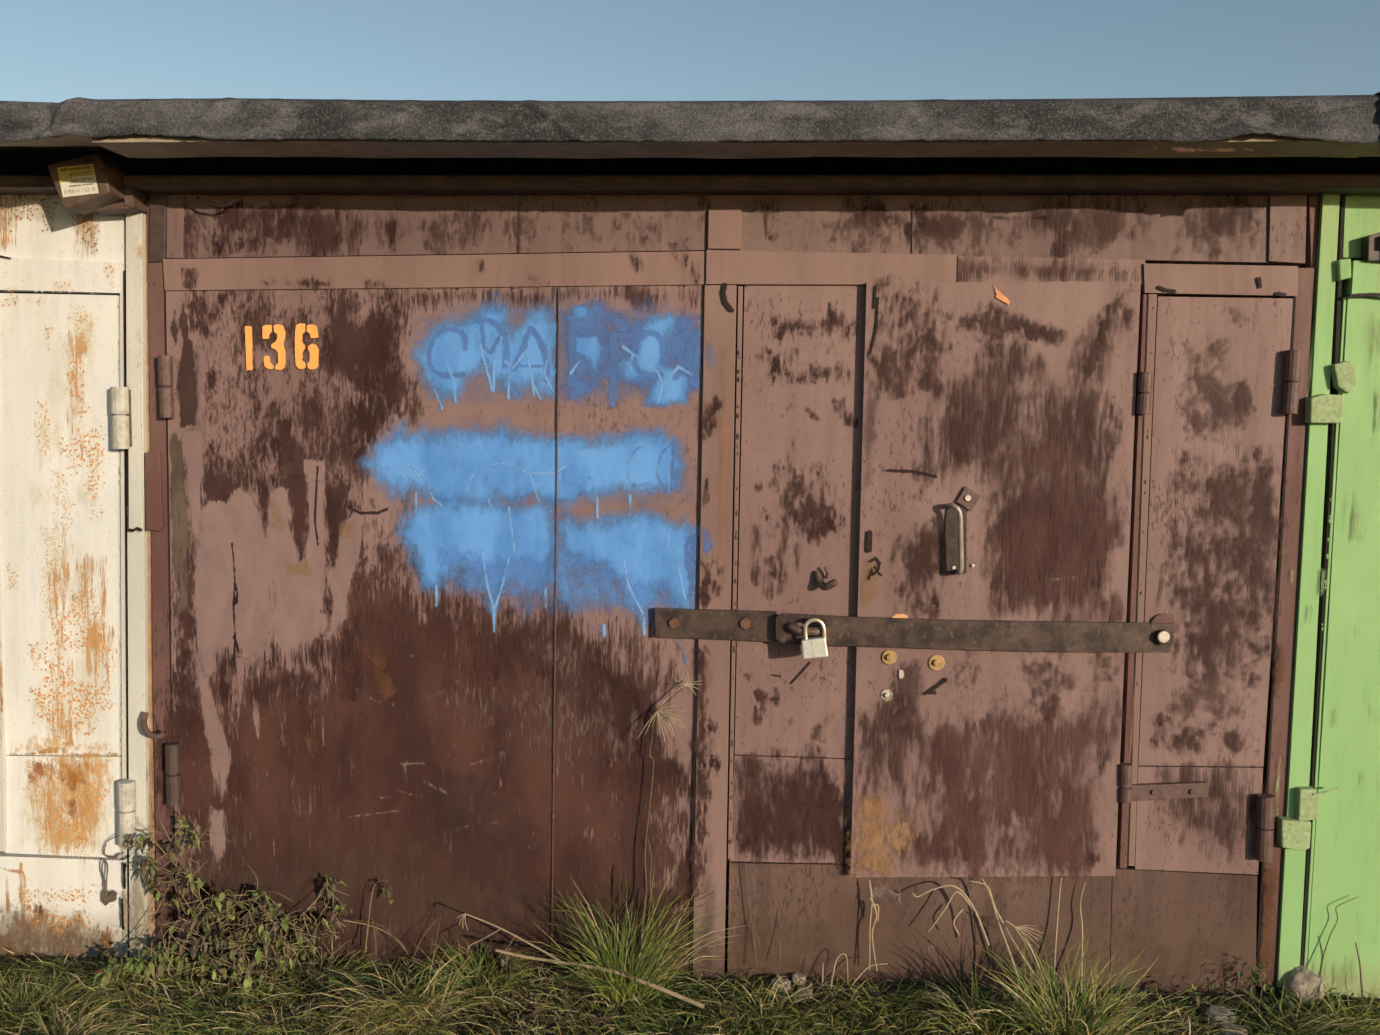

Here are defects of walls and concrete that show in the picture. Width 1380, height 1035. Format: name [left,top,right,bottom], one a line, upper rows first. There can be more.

corrosion [0,194,100,254]
corrosion [24,306,117,863]
corrosion [850,789,913,879]
corrosion [0,863,114,957]